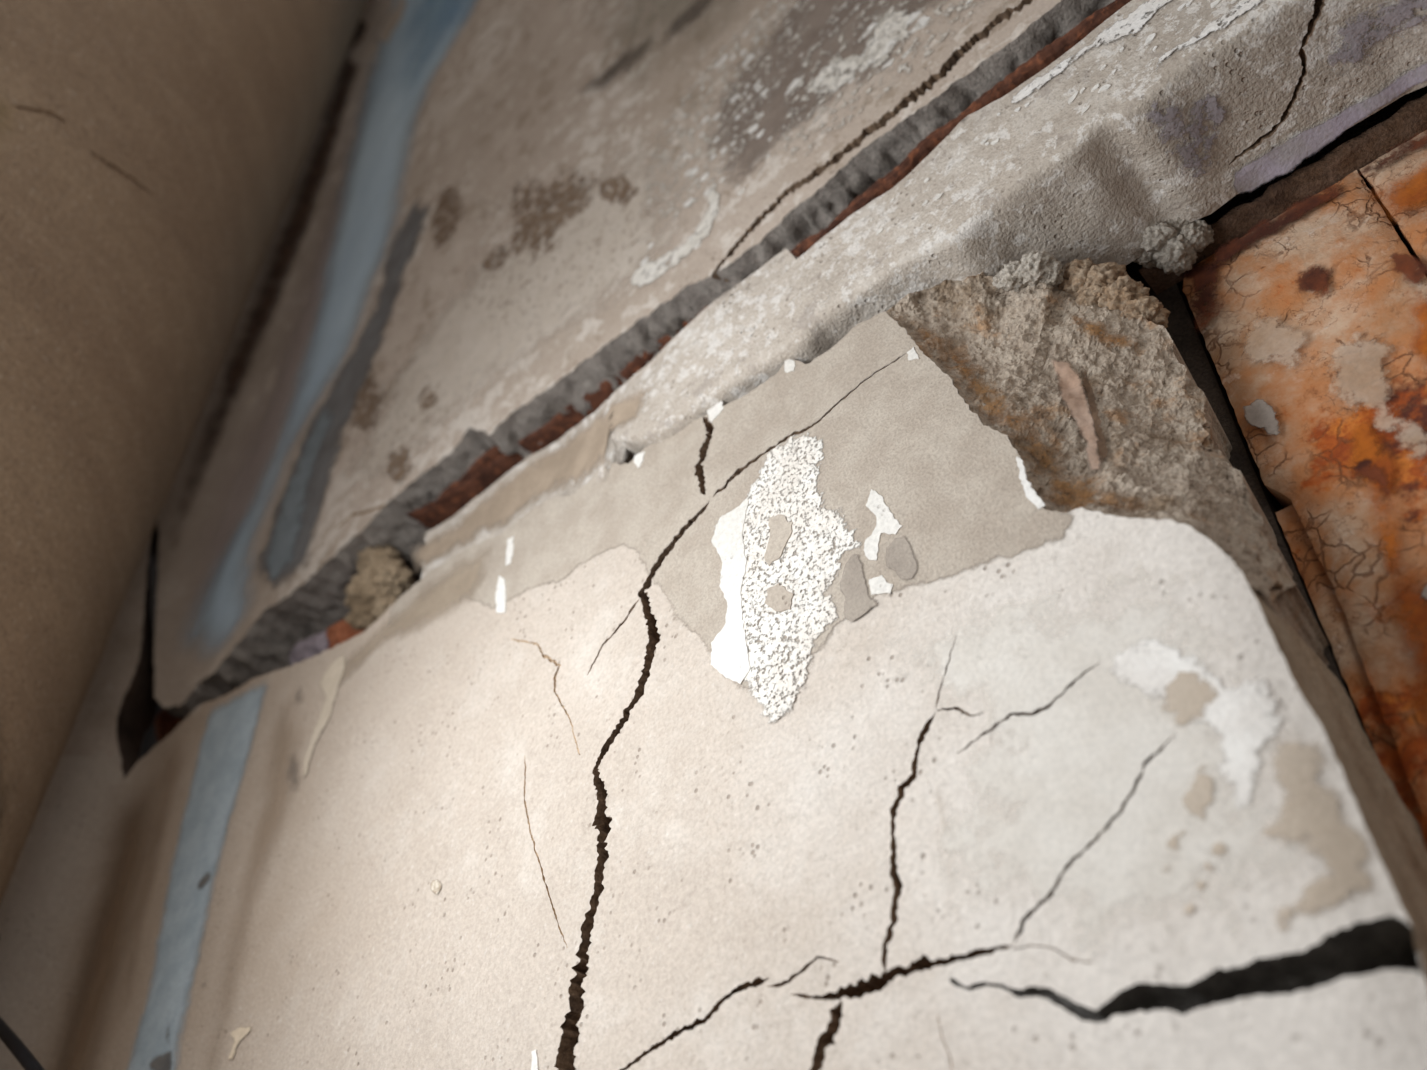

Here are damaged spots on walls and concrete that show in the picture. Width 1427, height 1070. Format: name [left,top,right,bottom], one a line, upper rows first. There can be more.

damp [429,167,659,330]
peeling [628,0,985,287]
rust [789,0,1132,258]
peeling [997,0,1261,116]
rust [1182,185,1340,329]
crack [1229,0,1325,165]
damp [350,364,440,486]
rust [406,305,709,538]
crack [116,0,1115,779]
peeling [389,250,1329,725]
crack [511,356,902,1070]
crack [620,635,1423,1070]